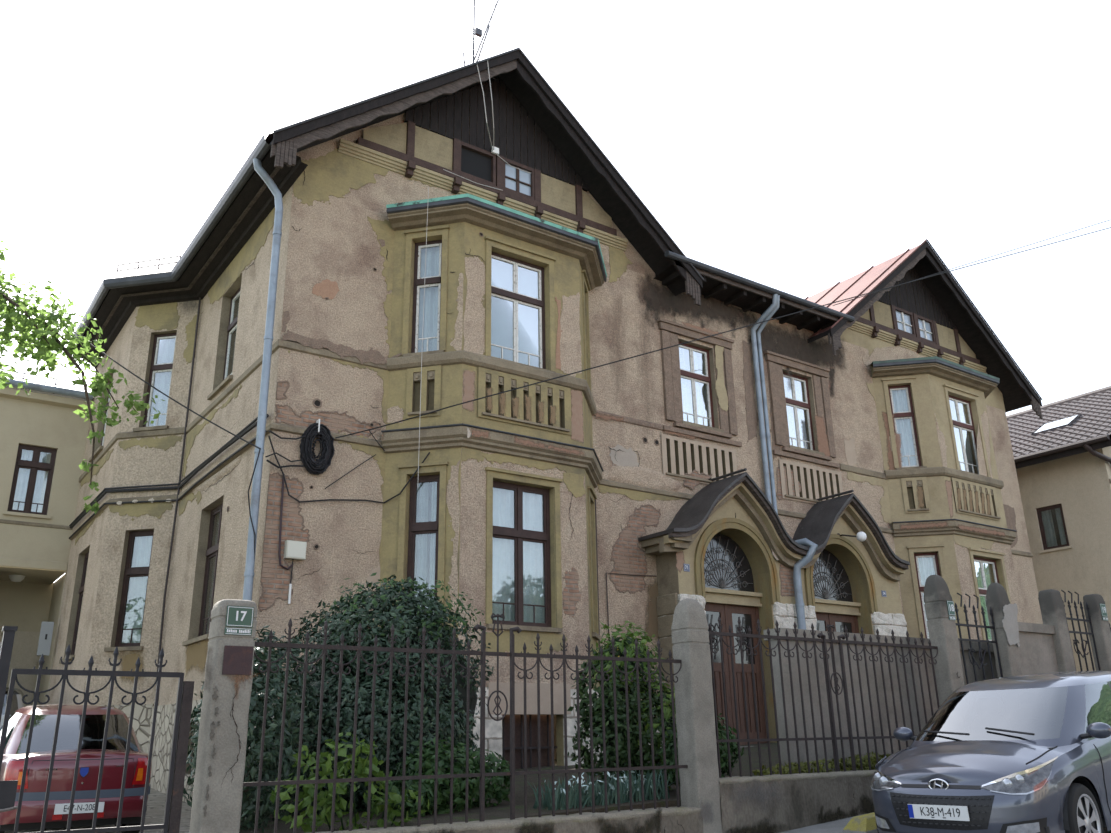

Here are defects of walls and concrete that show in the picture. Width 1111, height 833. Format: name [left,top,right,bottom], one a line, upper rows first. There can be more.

peeling [293,148,390,206]
peeling [135,302,200,364]
flaking render [275,216,409,500]
peeling [80,384,242,489]
flaking render [446,292,712,617]
peeling [75,491,202,545]
flaking render [258,472,310,612]
crack [221,694,241,785]